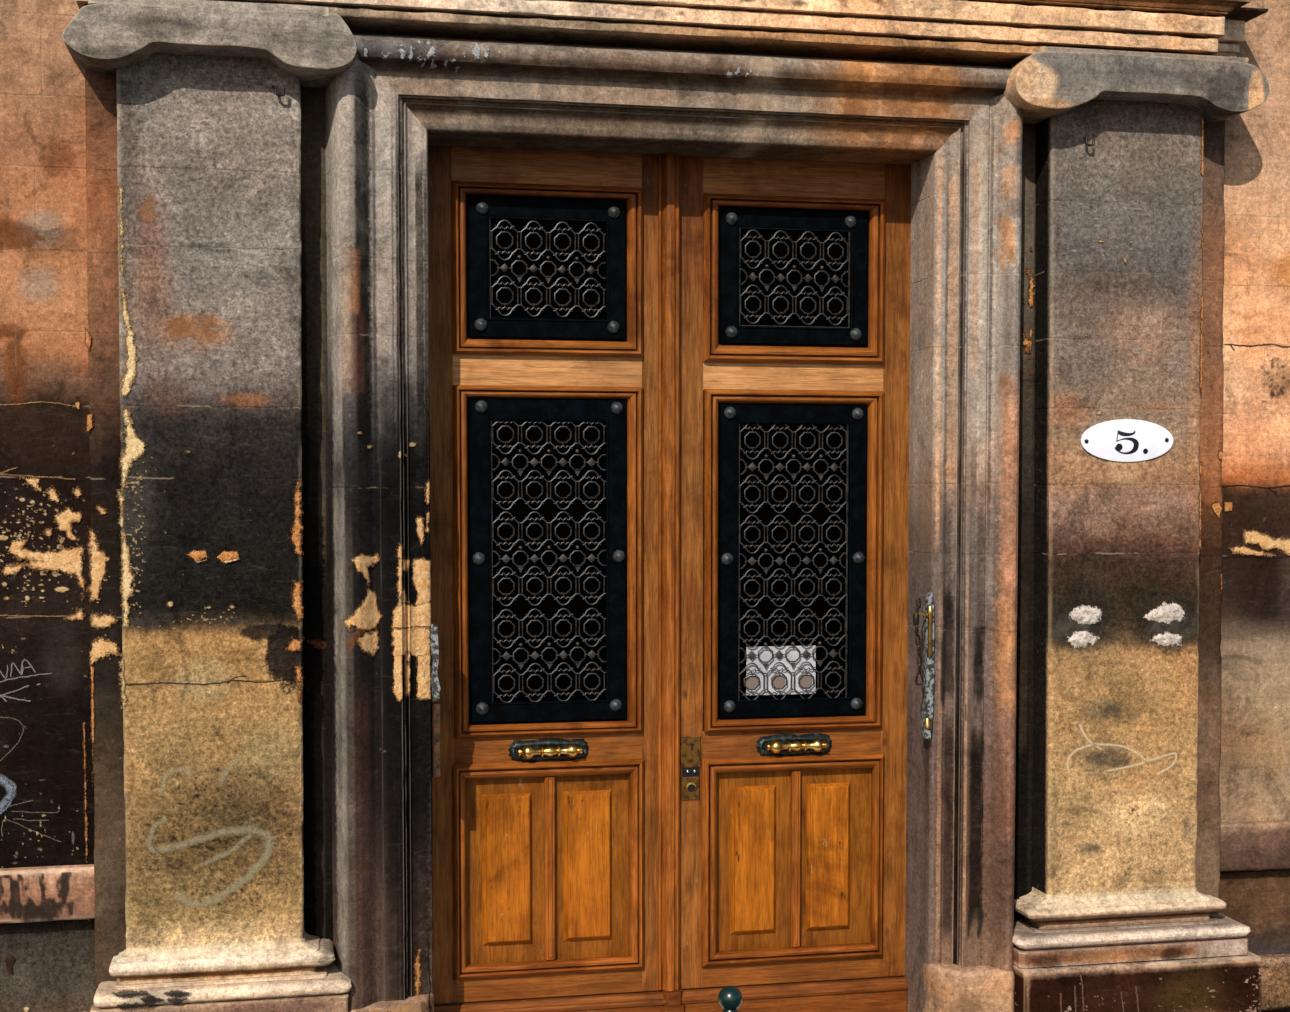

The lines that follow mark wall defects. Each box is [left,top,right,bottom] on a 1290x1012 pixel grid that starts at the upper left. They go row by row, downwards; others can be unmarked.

crack [1225,342,1290,350]
spalling [0,182,157,863]
spalling [186,549,240,564]
spalling [1227,529,1290,558]
spalling [331,479,431,702]
spalling [160,601,235,629]
leakage [1055,613,1089,645]
leakage [1150,614,1196,646]
spalling [111,990,190,1010]